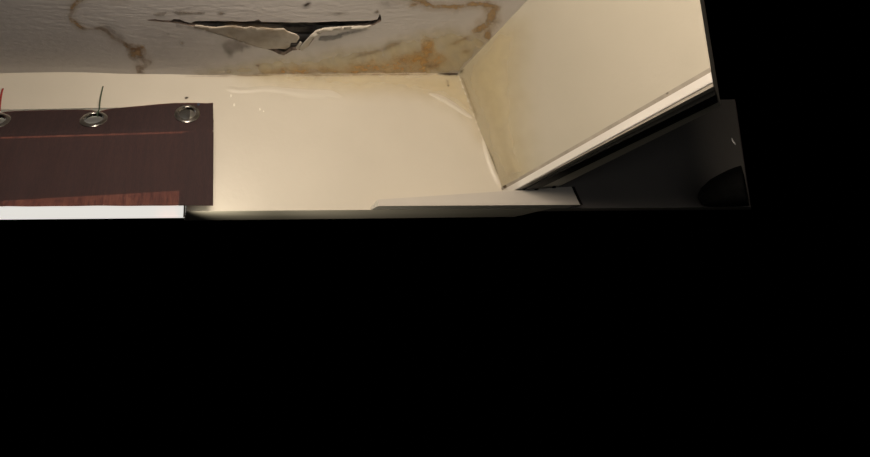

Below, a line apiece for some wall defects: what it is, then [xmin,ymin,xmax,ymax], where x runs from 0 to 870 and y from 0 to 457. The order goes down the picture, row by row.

peeling [175,11,380,52]
damp [262,0,497,74]